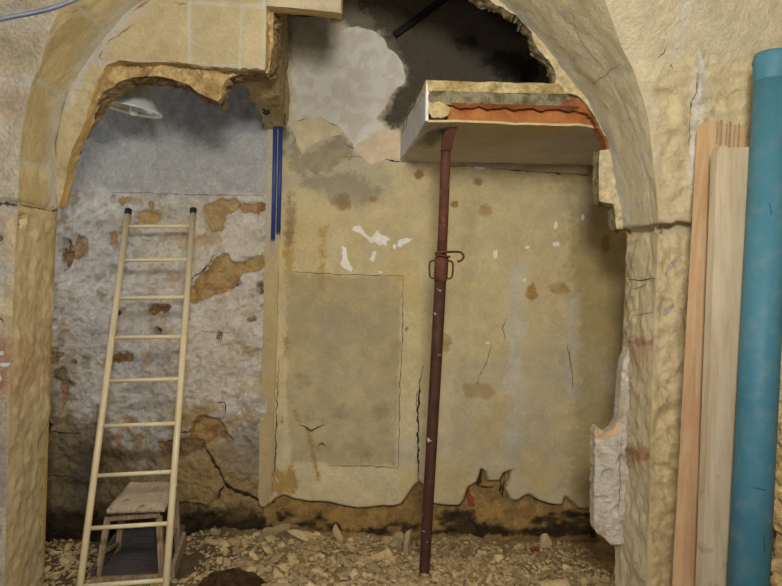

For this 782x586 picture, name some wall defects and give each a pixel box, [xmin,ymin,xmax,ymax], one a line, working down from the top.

flaking render [291,16,405,165]
flaking render [138,202,162,224]
flaking render [203,198,266,232]
peeling [340,246,353,272]
peeling [352,225,412,262]
flaking render [190,253,265,303]
crack [180,362,279,503]
flaking render [263,482,423,536]
leakage [361,523,422,535]
leakage [432,510,596,542]
flaking render [432,469,605,542]